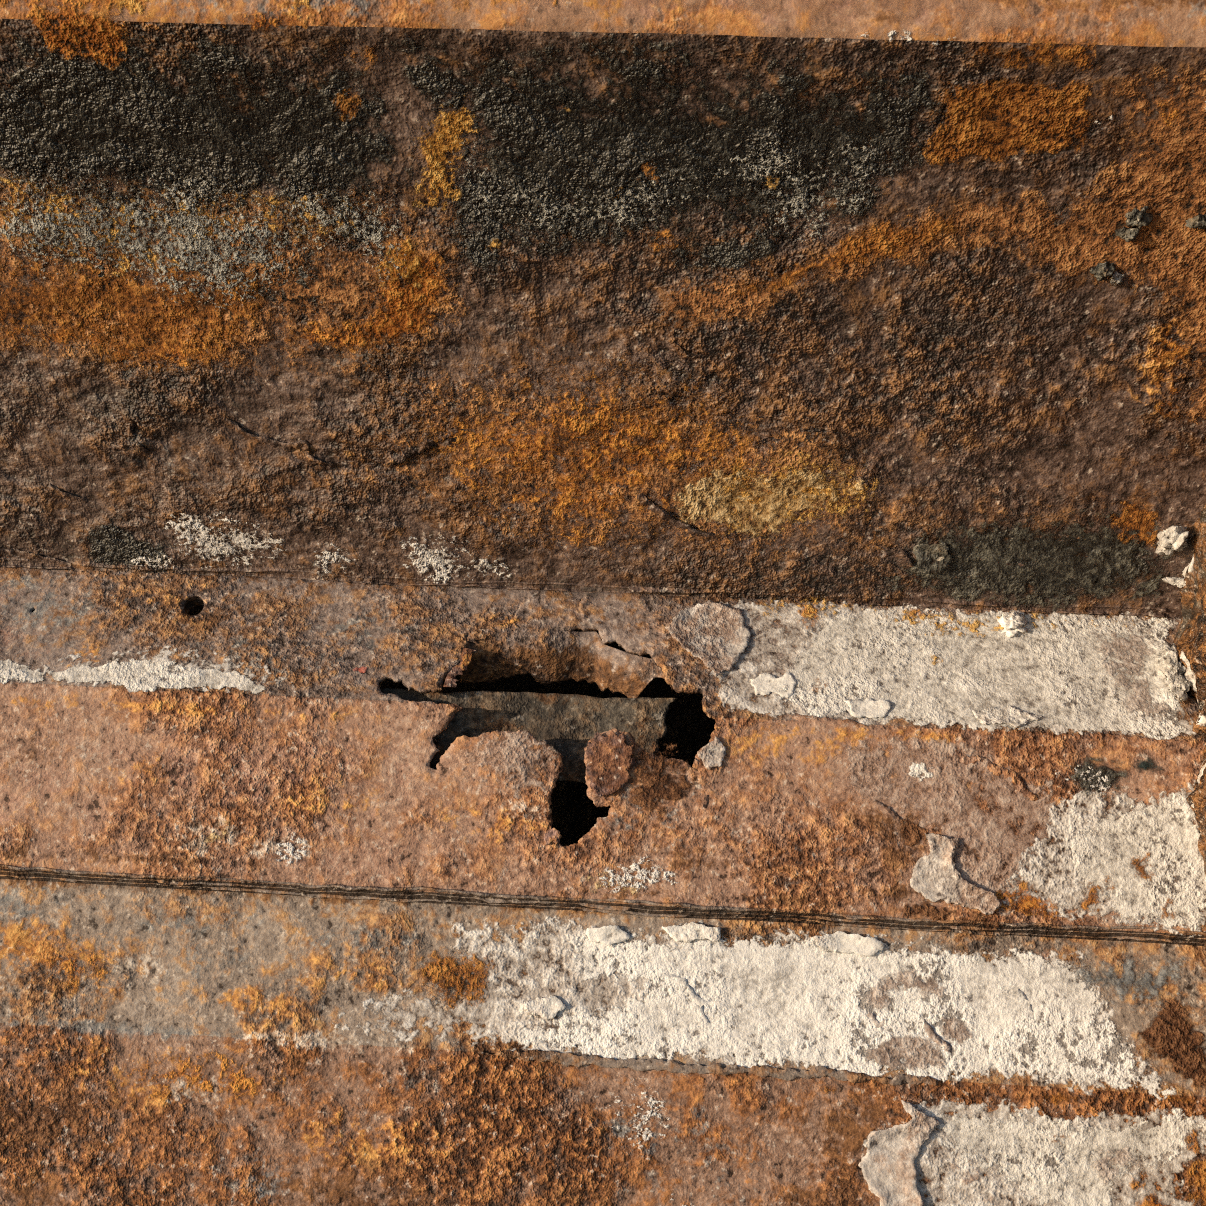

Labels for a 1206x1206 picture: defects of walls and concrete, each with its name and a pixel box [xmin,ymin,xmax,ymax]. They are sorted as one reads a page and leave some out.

rust [24,0,147,70]
rust [333,89,361,121]
rust [0,105,478,374]
rust [663,38,1206,425]
rust [381,364,860,557]
rust [1110,501,1159,546]
peeling [585,726,635,797]
peeling [665,600,1206,937]
peeling [544,828,562,845]
peeling [334,916,1206,1206]
rust [0,1083,115,1162]
rust [804,1100,873,1206]